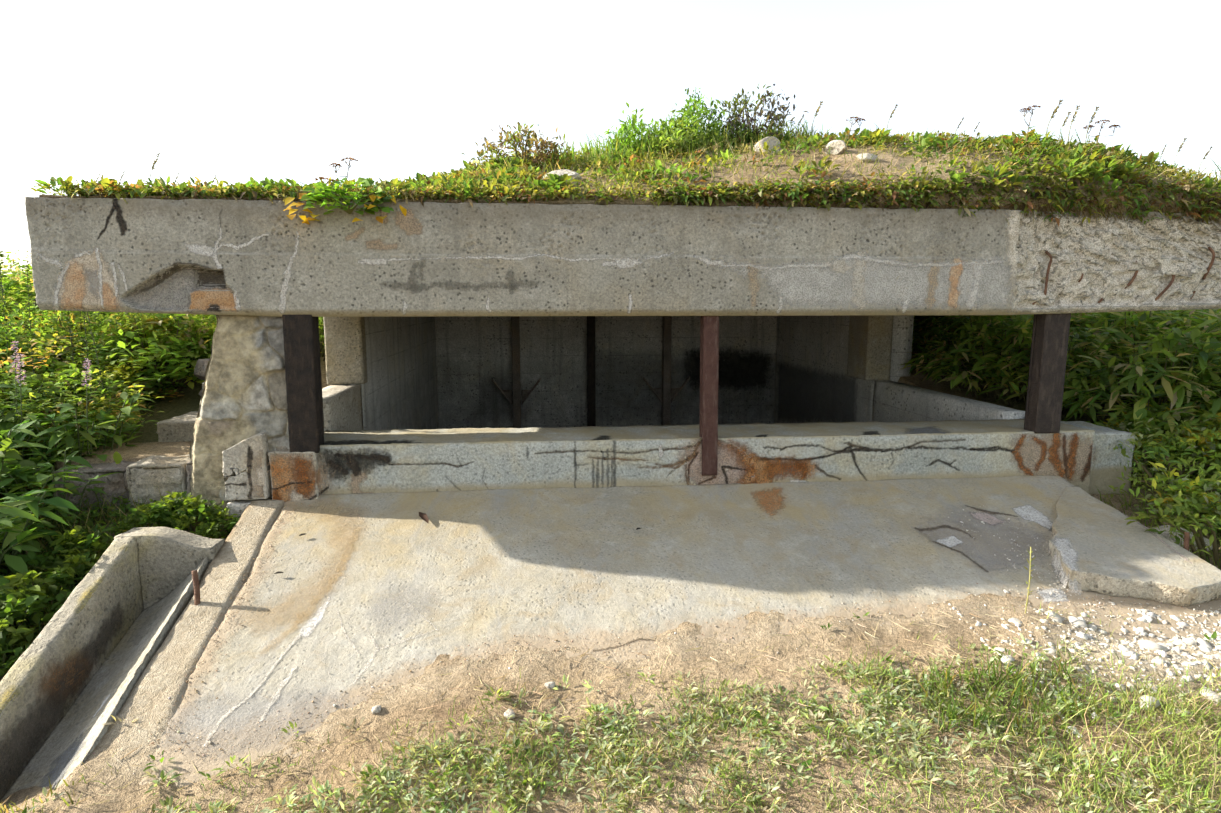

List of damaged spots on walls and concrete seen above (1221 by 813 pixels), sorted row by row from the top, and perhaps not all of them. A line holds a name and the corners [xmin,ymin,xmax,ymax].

corrosion [54,248,128,310]
spalling [121,262,240,312]
crack [186,220,299,313]
spalling [1006,211,1221,313]
corrosion [253,448,329,502]
crack [389,462,483,492]
crack [535,445,697,485]
corrosion [656,440,816,516]
corrosion [970,433,1093,482]
peeling [915,525,988,572]
peeling [965,505,1078,602]
water stain [203,597,330,747]